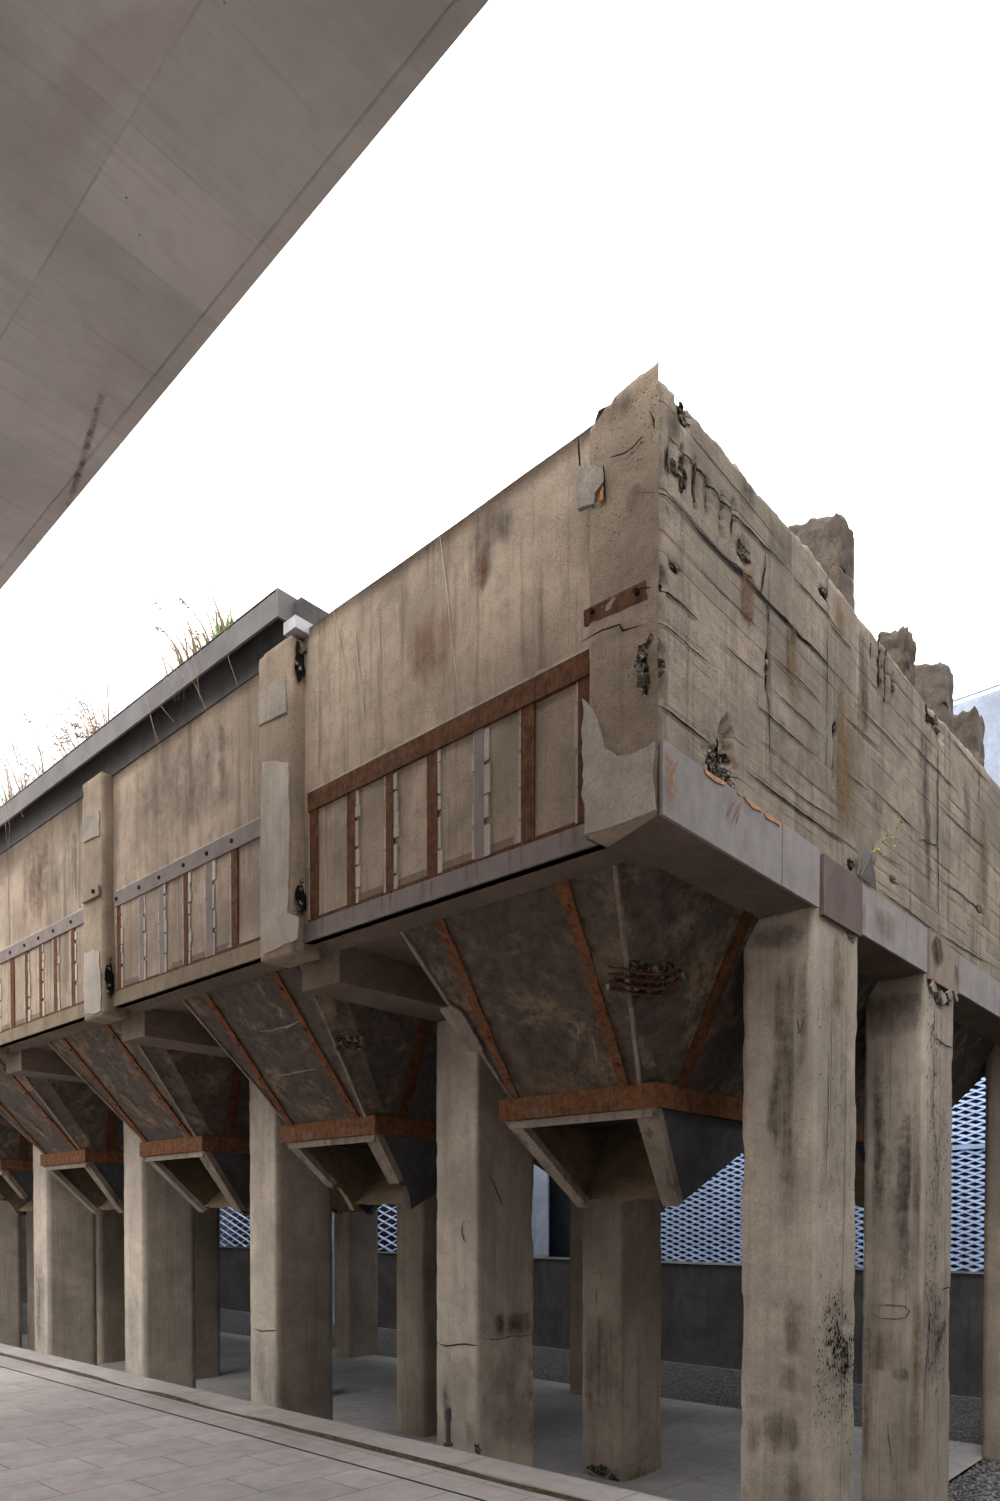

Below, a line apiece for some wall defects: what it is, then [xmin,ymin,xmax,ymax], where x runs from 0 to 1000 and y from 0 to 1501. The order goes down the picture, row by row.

spalling [665,445,751,564]
spalling [634,633,665,698]
crack [578,410,988,963]
spalling [704,738,781,826]